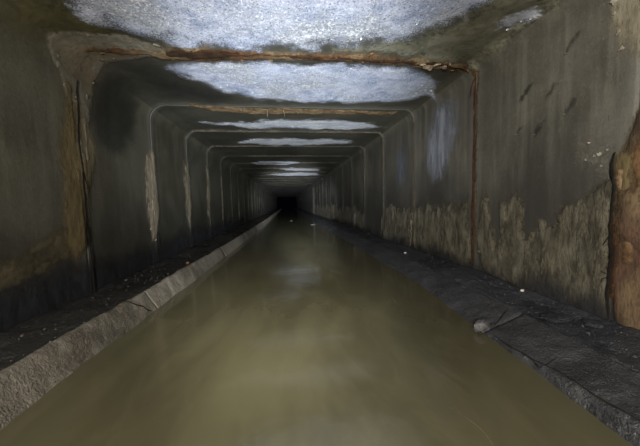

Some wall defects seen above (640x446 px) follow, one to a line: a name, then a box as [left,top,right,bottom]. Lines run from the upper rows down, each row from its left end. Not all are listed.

damp [2,0,562,72]
damp [168,60,436,104]
crack [76,83,95,292]
rust [85,46,479,267]
damp [185,119,384,151]
damp [427,105,454,176]
damp [312,179,620,324]